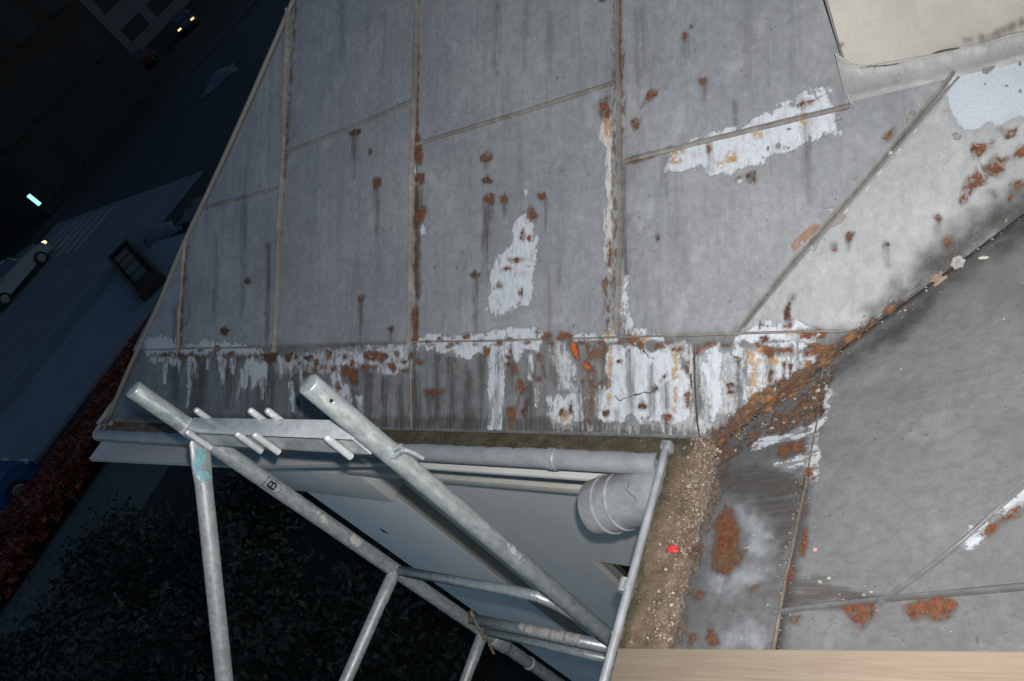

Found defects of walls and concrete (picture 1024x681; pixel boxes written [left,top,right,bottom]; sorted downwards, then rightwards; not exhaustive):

peeling [662,85,843,177]
peeling [945,61,1024,140]
corrosion [958,127,1024,203]
corrosion [153,49,452,409]
peeling [144,98,826,436]
corrosion [526,201,624,425]
corrosion [755,342,841,360]
leakage [871,193,1024,347]
peeling [750,384,834,482]
corrosion [711,505,750,575]
corrosion [842,603,874,628]
corrosion [905,596,958,620]